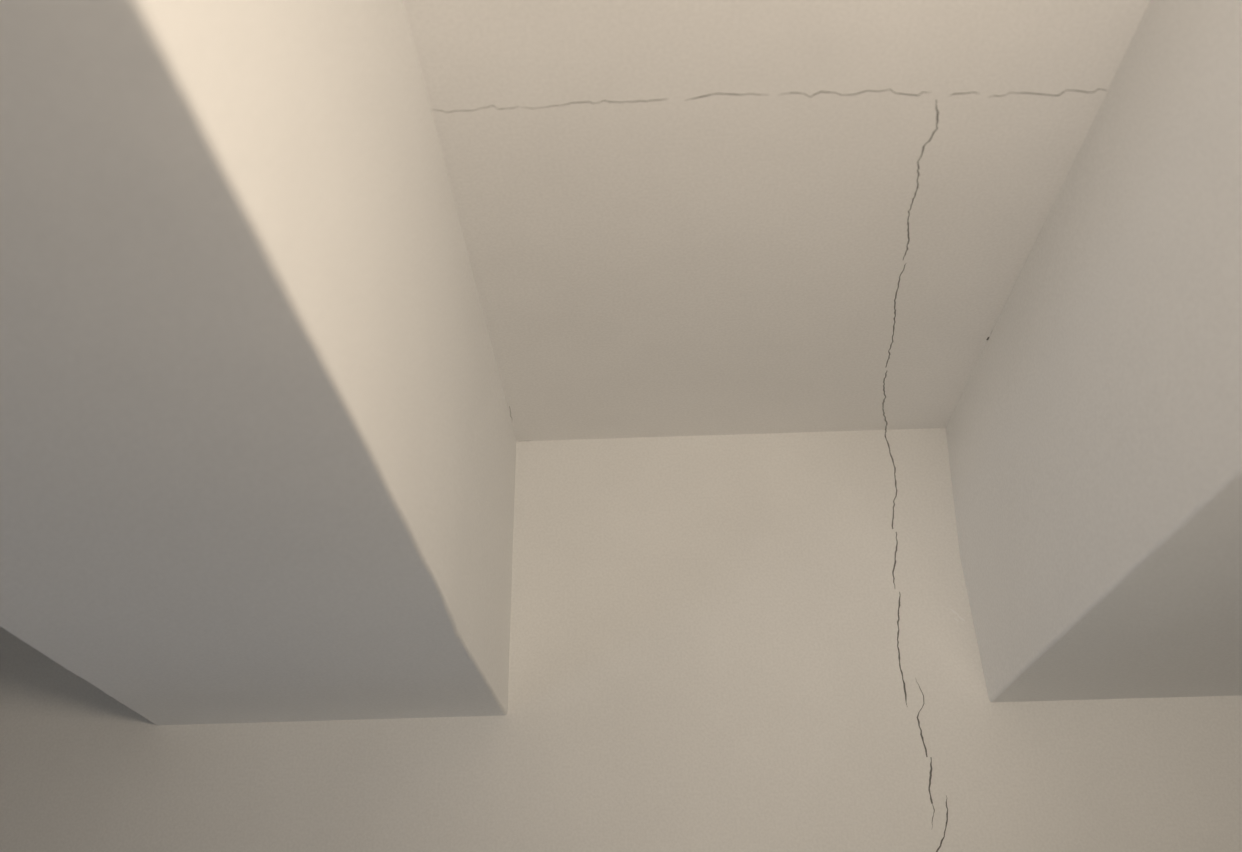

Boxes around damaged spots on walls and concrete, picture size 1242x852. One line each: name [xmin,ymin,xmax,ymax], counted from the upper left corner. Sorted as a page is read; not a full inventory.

crack [431,88,1107,852]